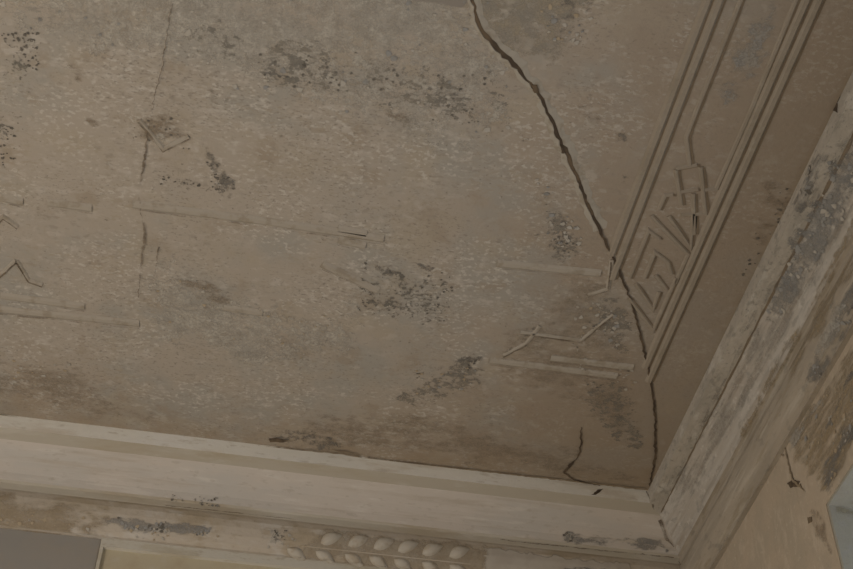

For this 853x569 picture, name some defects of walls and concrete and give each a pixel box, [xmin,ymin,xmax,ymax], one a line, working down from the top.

crack [258,0,681,565]